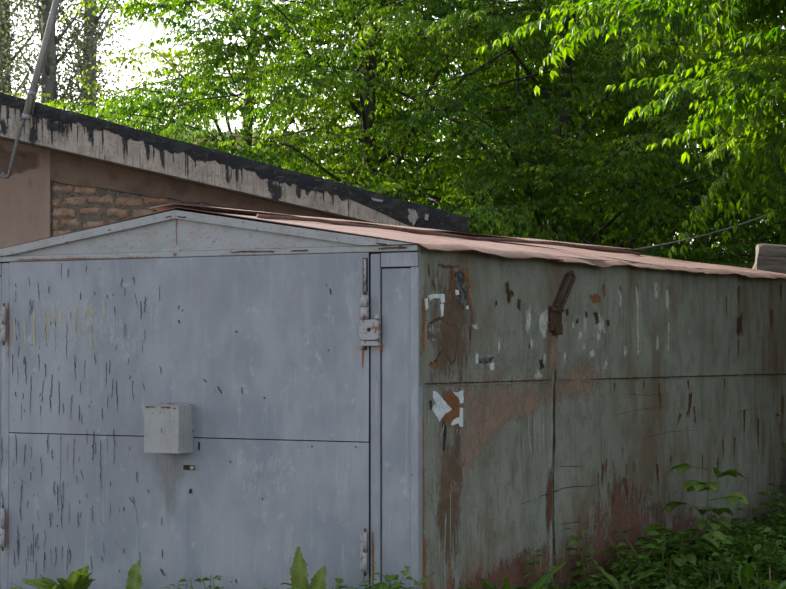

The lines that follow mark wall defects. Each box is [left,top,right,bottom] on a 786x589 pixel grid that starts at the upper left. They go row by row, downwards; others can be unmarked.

damp [0,148,37,174]
corrosion [422,263,572,391]
peeling [525,301,548,347]
peeling [572,314,606,357]
corrosion [590,374,786,423]
peeling [437,428,463,564]
corrosion [448,539,572,589]